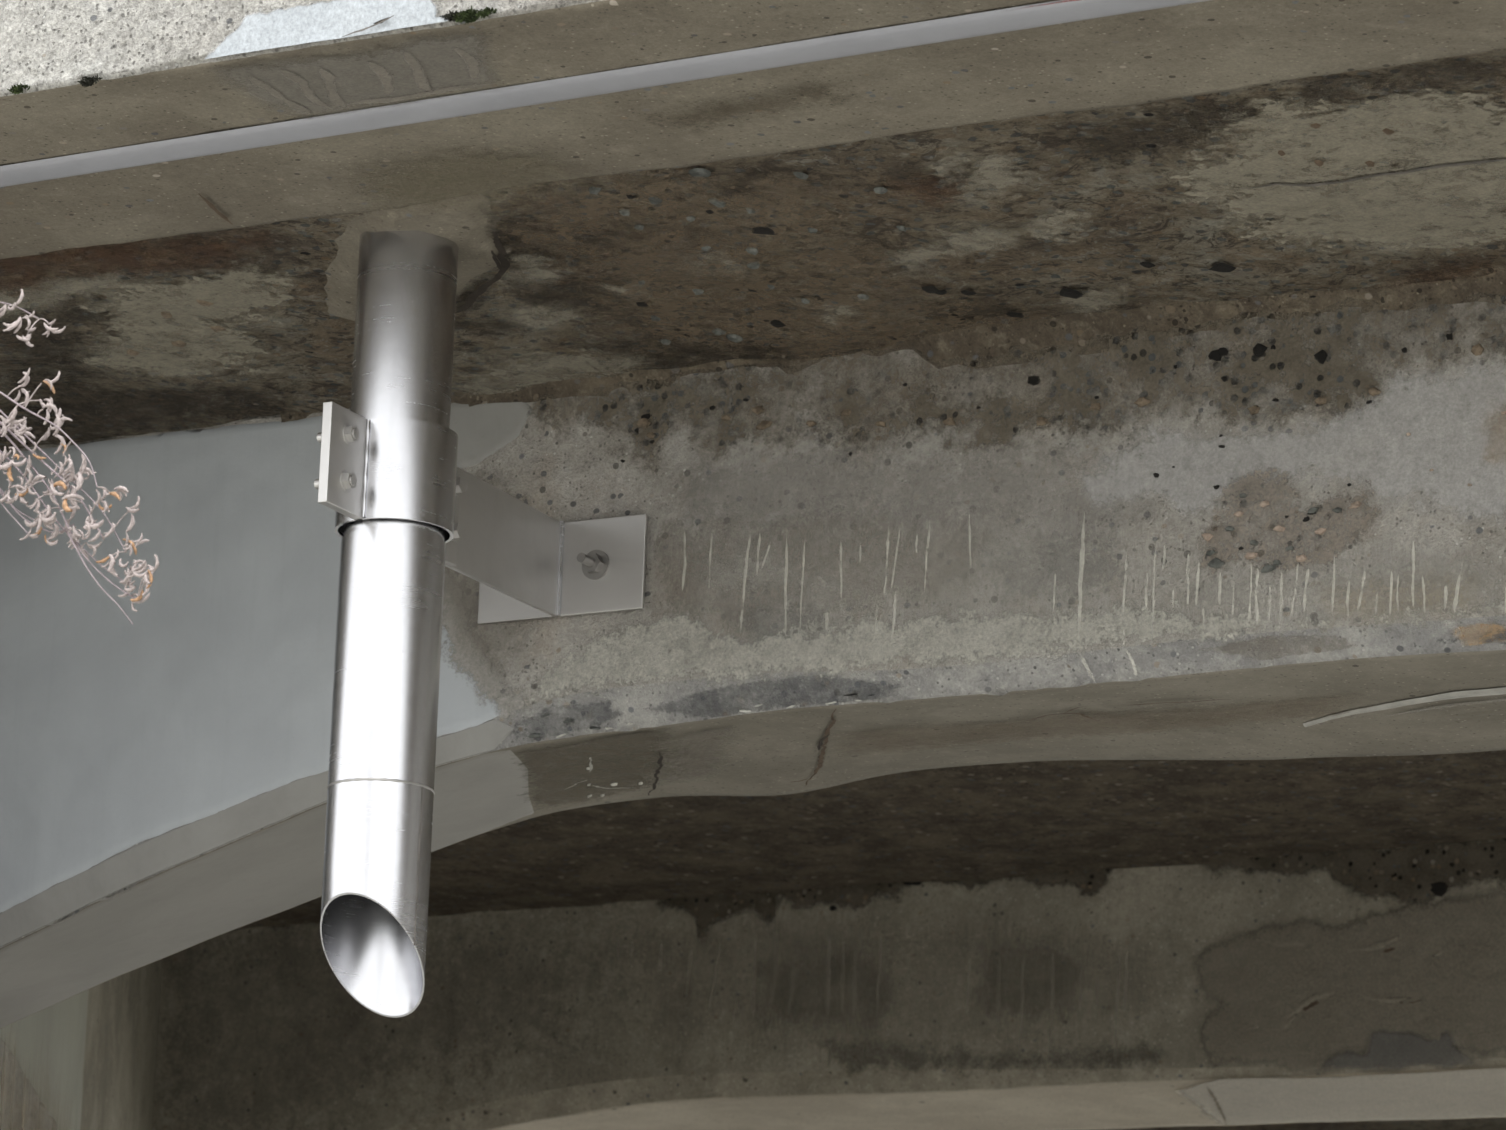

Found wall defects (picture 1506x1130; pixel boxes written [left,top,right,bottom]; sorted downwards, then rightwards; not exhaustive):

water stain [1272,62,1504,106]
water stain [1074,100,1256,170]
water stain [0,254,294,445]
water stain [561,330,792,370]
peeling [455,292,1506,574]
water stain [528,521,1506,704]
spalling [515,701,633,739]
spalling [654,675,898,717]
crack [1303,687,1506,727]
crack [794,709,836,785]
crack [648,752,663,796]